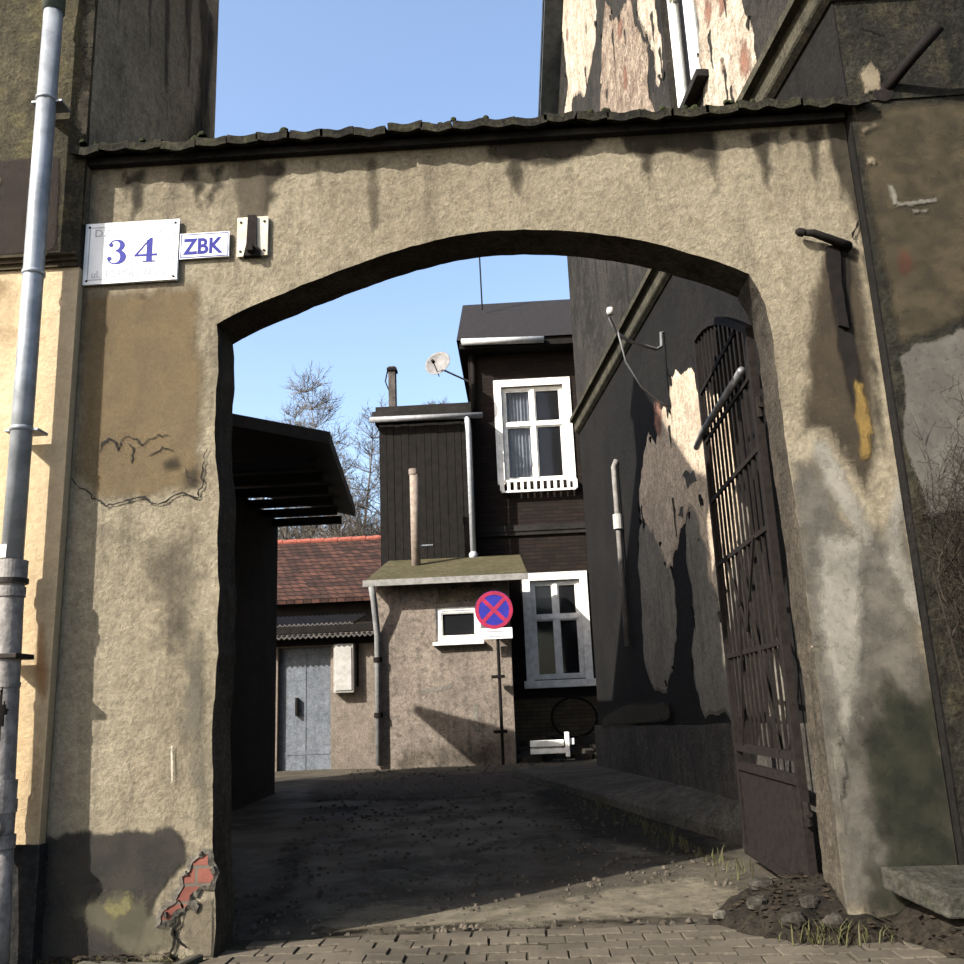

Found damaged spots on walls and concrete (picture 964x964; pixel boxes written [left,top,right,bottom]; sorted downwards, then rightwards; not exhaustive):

water stain [186,0,214,138]
peeling [562,0,665,113]
peeling [694,0,757,106]
water stain [182,166,223,201]
water stain [235,159,284,218]
water stain [369,159,377,226]
water stain [487,138,594,188]
water stain [623,131,717,172]
rust [805,249,880,485]
crack [71,450,207,507]
peeling [637,368,786,721]
spalling [155,848,220,956]